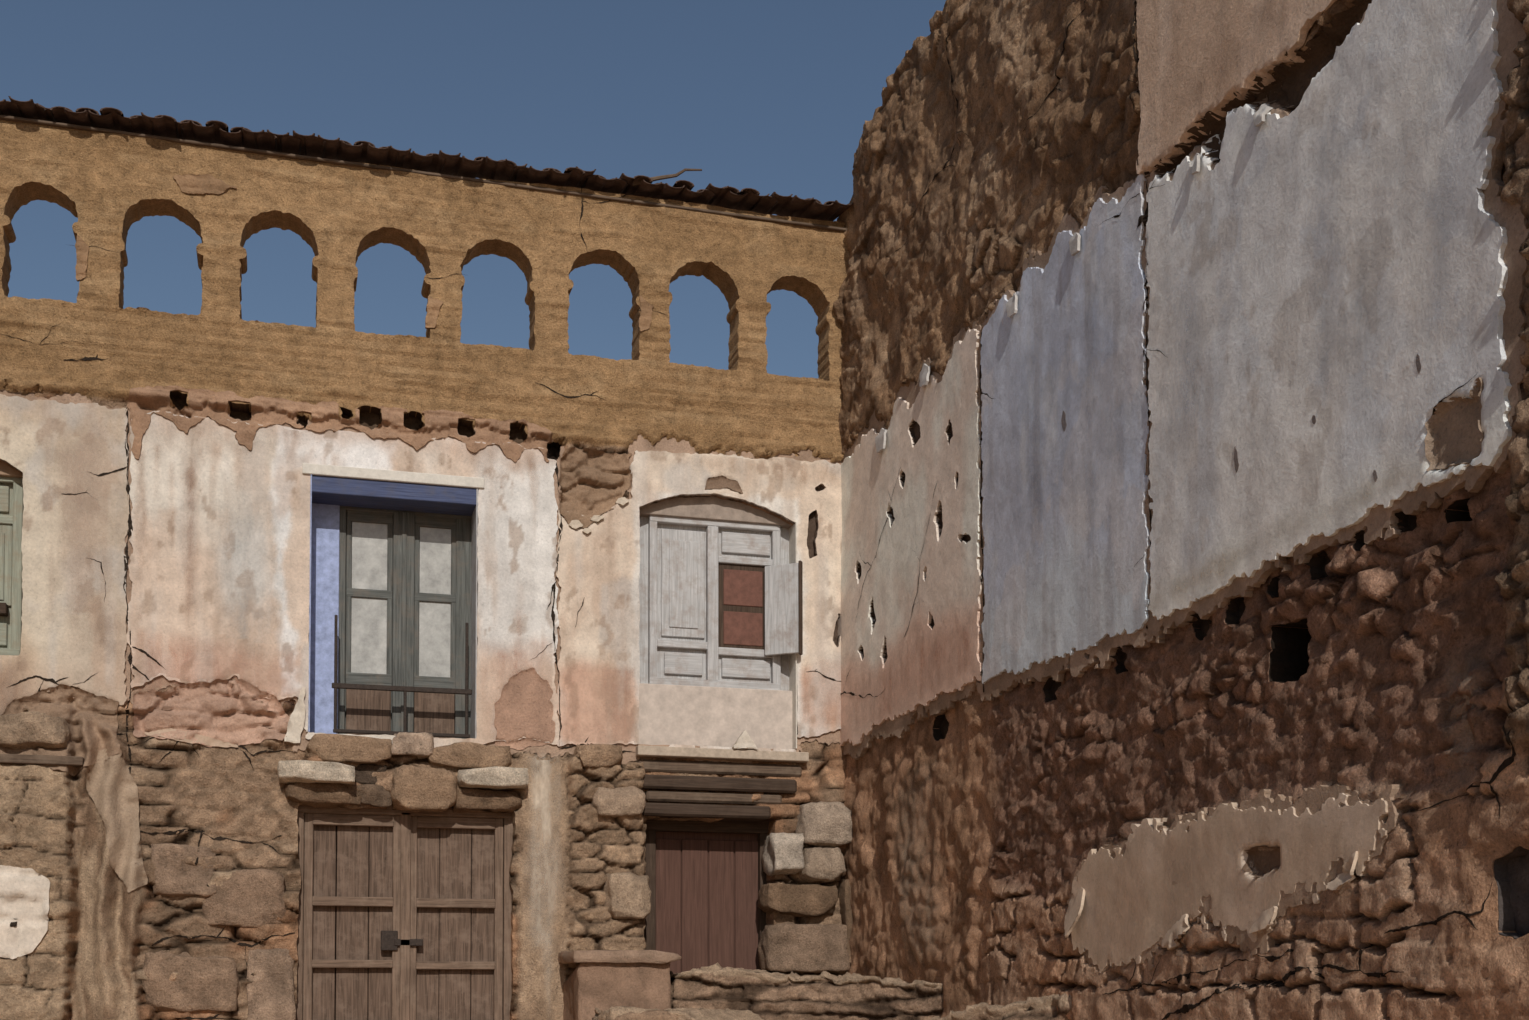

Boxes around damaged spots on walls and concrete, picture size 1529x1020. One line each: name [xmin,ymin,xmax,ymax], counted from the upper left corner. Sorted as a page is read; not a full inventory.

flaking render [127,385,633,534]
flaking render [1425,377,1484,471]
crack [537,456,632,753]
flaking render [0,679,305,776]
flaking render [494,667,555,750]
crack [1417,678,1529,817]
flaking render [1242,846,1281,878]
peeling [1327,851,1358,890]
peeling [1064,887,1085,938]
peeling [1162,914,1192,949]
peeling [1249,906,1278,933]